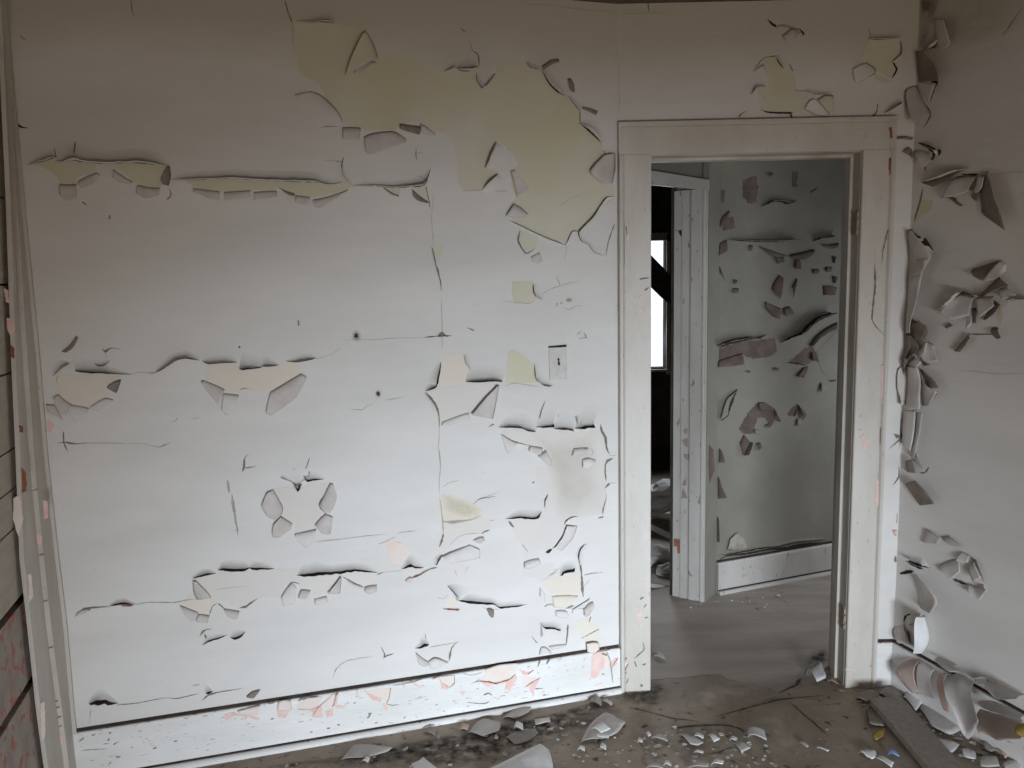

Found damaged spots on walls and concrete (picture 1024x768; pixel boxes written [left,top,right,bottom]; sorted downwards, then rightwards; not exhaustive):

peeling [28,140,431,208]
peeling [285,1,630,264]
crack [424,196,450,341]
peeling [717,190,839,392]
peeling [853,18,1006,505]
peeling [934,260,1024,352]
crack [60,431,84,451]
peeling [46,337,340,432]
crack [435,418,443,494]
peeling [739,402,807,456]
peeling [74,349,665,729]
peeling [893,529,986,654]